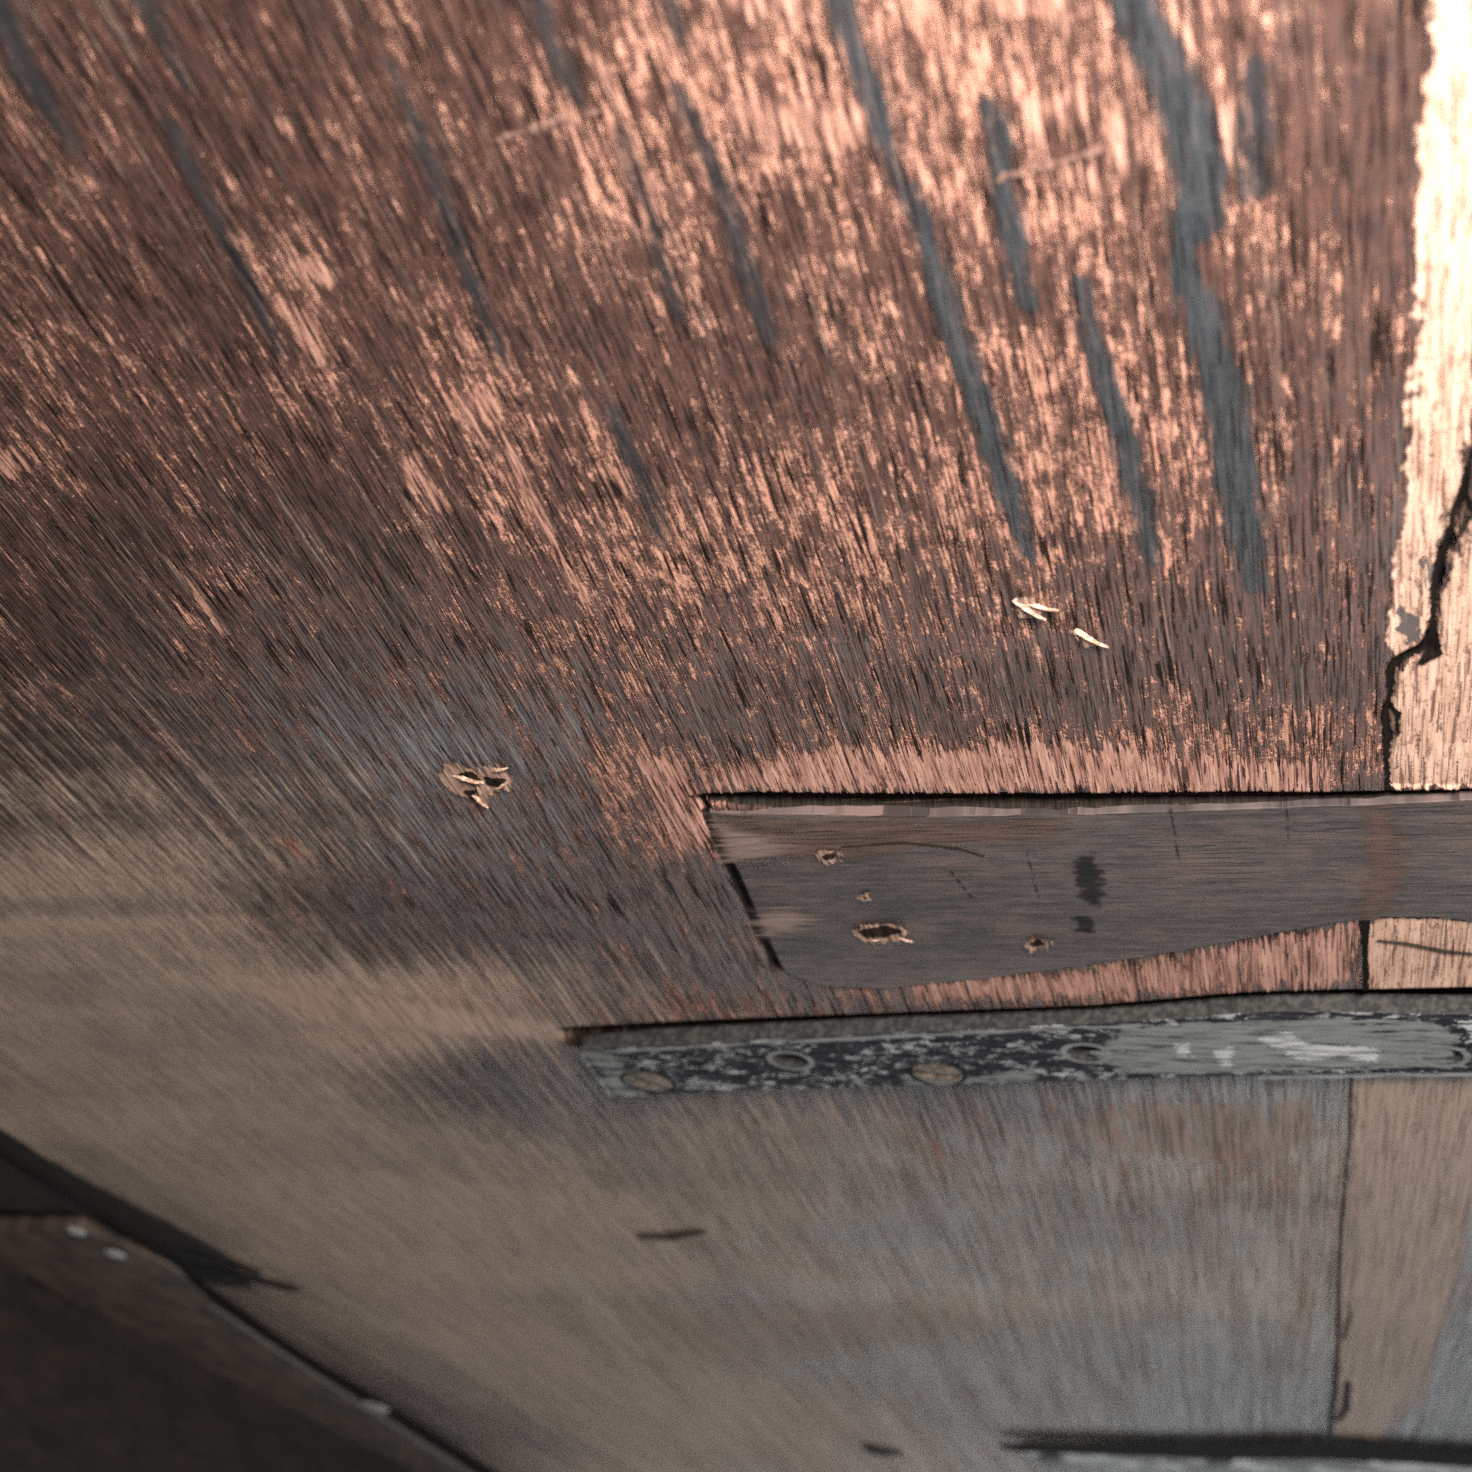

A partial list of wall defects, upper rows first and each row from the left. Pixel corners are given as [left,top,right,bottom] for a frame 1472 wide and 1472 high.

peeling [1395,554,1437,645]
crack [1381,421,1472,791]